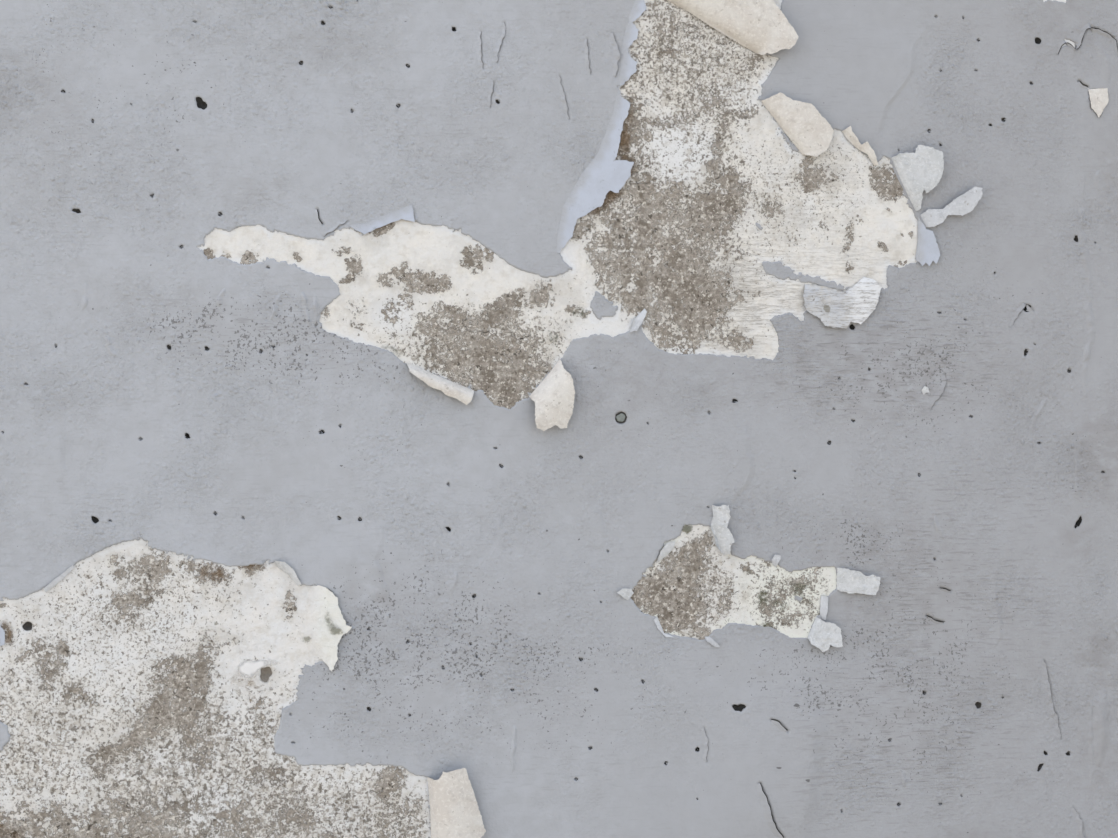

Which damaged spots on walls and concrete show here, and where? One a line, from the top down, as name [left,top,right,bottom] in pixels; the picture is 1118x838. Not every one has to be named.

crack [1056,24,1118,56]
peeling [1088,88,1109,117]
peeling [197,0,982,431]
peeling [617,505,880,652]
peeling [0,535,486,838]
crack [771,719,787,733]
crack [757,783,784,838]